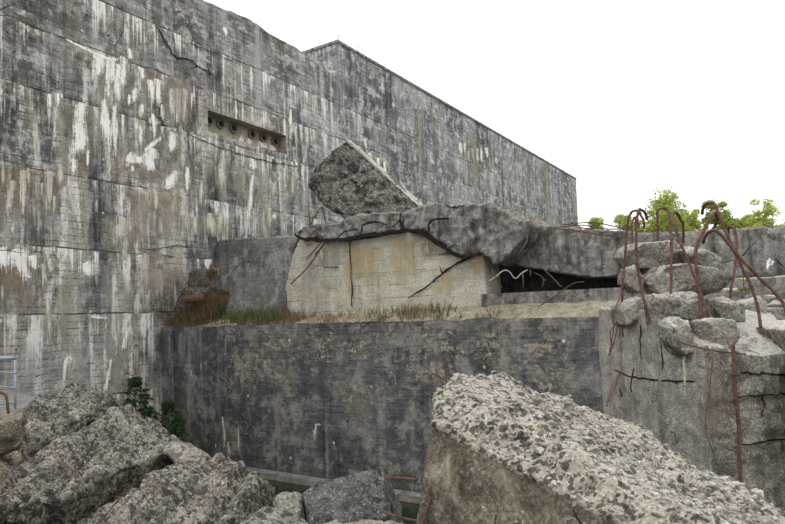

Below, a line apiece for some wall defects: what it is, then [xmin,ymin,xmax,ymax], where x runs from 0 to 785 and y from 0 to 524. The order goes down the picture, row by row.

crack [152,18,232,86]
water stain [0,39,224,381]
crack [295,213,471,307]